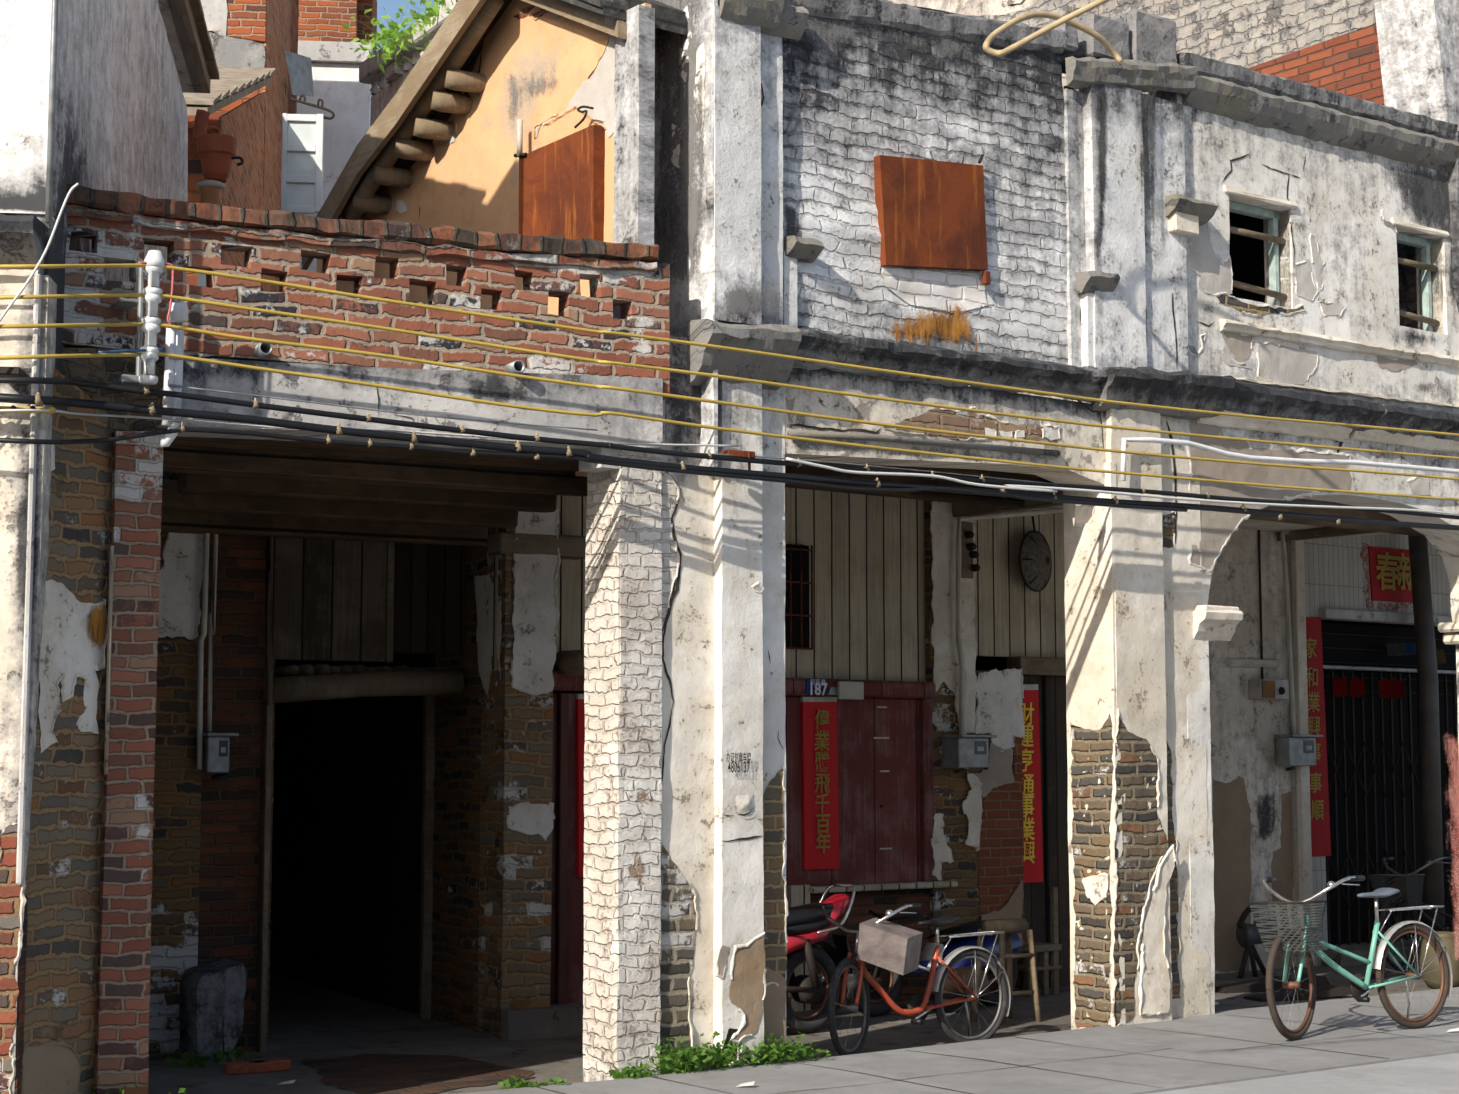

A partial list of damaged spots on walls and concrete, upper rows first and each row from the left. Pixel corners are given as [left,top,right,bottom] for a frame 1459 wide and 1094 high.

water stain [805,16,971,58]
rust [891,303,978,352]
flaking render [1187,223,1346,385]
flaking render [0,822,27,1094]
flaking render [63,674,90,727]
crack [662,472,685,781]
flaking render [660,844,699,1074]
flaking render [715,769,789,1063]
flaking render [931,693,1025,876]
flaking render [990,668,1024,698]
flaking render [1070,709,1182,1028]